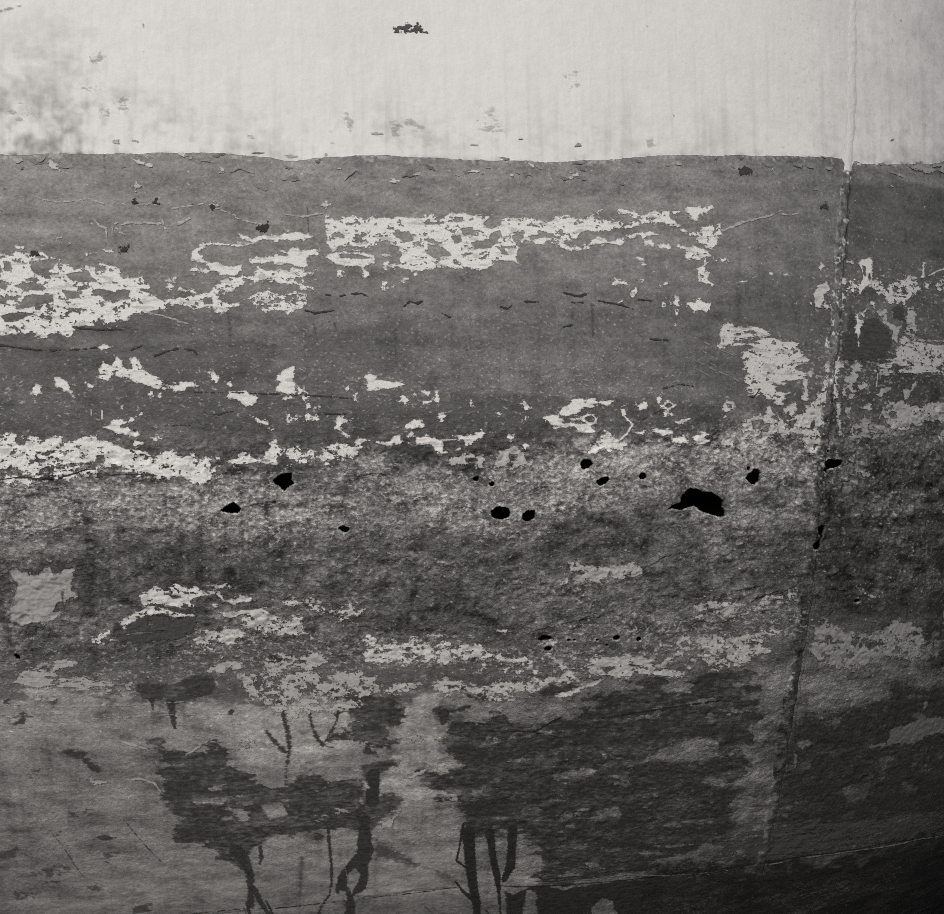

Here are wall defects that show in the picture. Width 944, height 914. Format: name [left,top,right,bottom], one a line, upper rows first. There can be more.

peeling [561,161,586,180]
peeling [0,201,731,339]
peeling [53,344,199,398]
peeling [542,247,944,477]
peeling [0,366,533,491]
spalling [745,467,759,484]
spalling [668,488,724,517]
leakage [448,684,494,700]
leakage [539,684,605,701]
leakage [437,709,449,725]
crack [494,835,940,887]